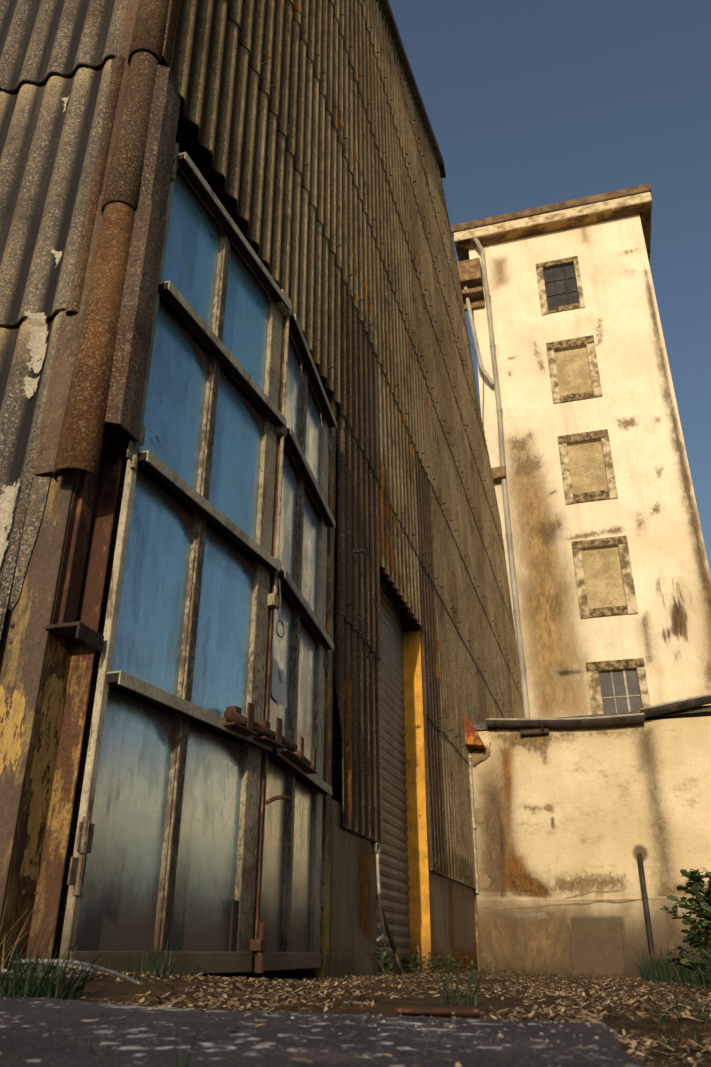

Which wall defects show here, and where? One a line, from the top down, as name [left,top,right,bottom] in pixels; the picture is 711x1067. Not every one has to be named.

peeling [21,376,40,398]
damp [511,434,621,718]
damp [663,585,687,642]
peeling [0,674,65,885]
damp [484,772,513,898]